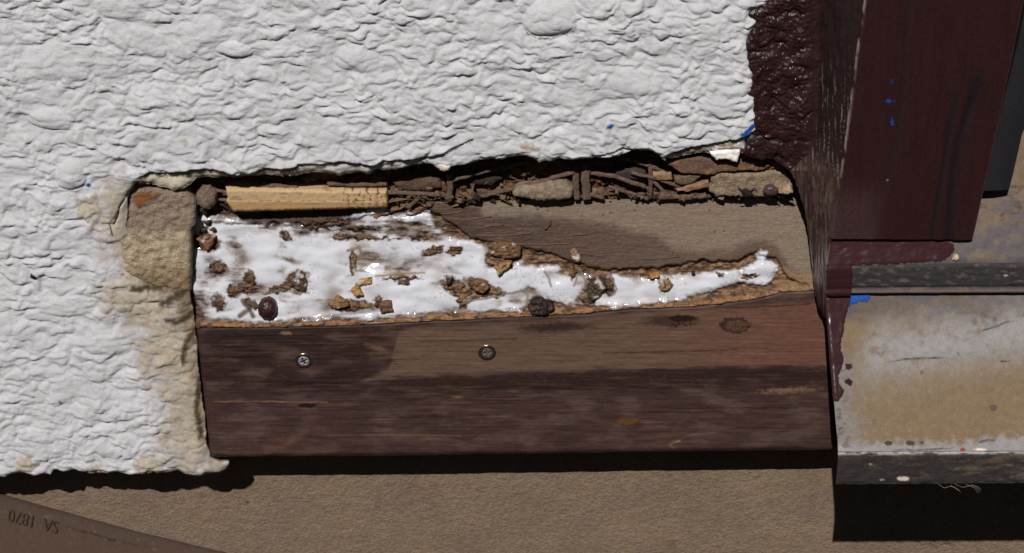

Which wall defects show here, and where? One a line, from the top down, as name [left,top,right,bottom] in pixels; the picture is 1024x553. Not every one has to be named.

spalling [664,141,740,163]
peeling [140,168,304,190]
peeling [673,171,701,185]
leakage [131,285,186,306]
leakage [165,310,193,324]
leakage [181,330,195,364]
leakage [195,378,203,438]